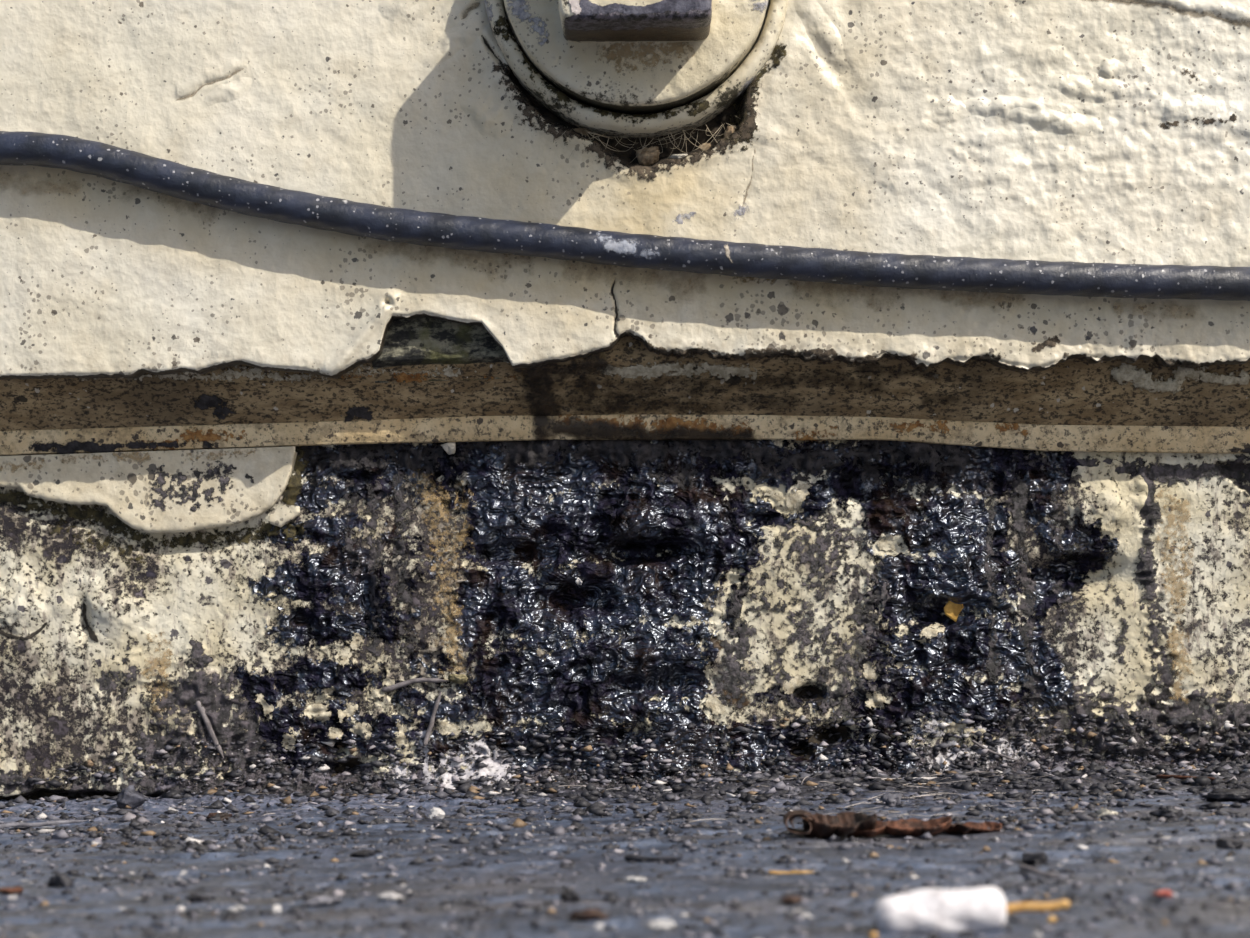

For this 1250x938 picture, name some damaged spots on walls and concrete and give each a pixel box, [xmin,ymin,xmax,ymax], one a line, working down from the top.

crack [1091,0,1250,27]
crack [177,70,241,100]
spalling [491,63,760,182]
spalling [324,289,509,383]
spalling [604,332,917,365]
spalling [967,353,1006,363]
spalling [1032,335,1086,360]
rust [558,414,753,433]
rust [879,420,952,434]
peeling [0,446,301,533]
water stain [236,353,1182,789]
spalling [790,725,850,759]